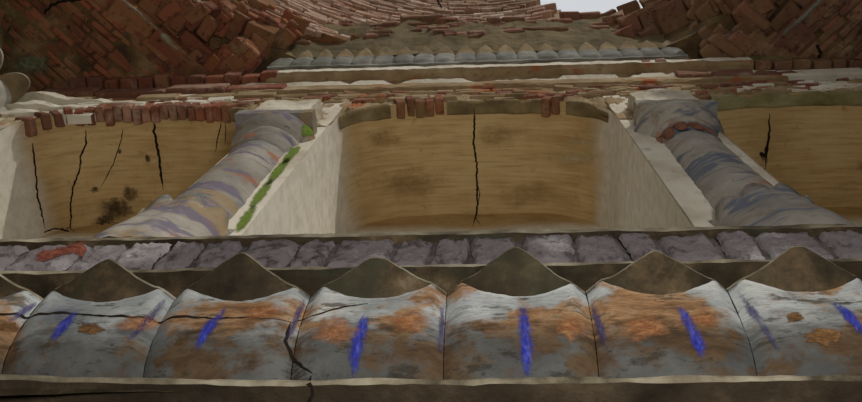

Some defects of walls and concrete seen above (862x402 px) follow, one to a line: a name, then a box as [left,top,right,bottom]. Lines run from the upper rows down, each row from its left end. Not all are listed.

crack [32,130,87,233]
crack [101,129,123,186]
leakage [96,188,136,225]
crack [152,123,164,189]
crack [472,109,480,224]
crack [759,113,771,170]
crack [0,303,368,402]